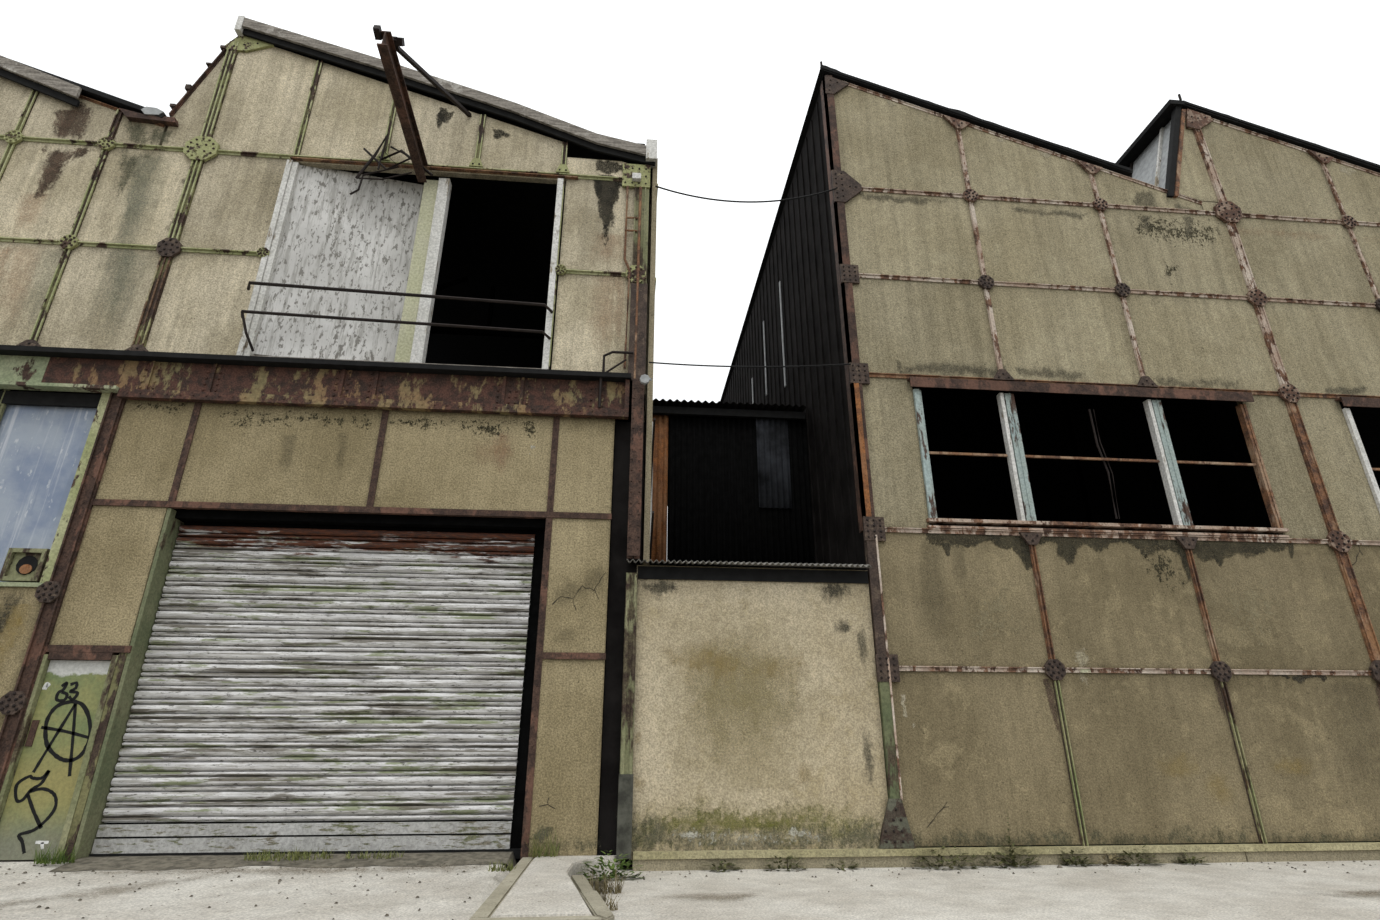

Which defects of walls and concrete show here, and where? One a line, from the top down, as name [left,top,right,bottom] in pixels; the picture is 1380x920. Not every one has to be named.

water stain [34,102,93,197]
water stain [593,160,623,236]
water stain [1134,192,1220,247]
rust [854,383,872,517]
water stain [673,827,819,845]